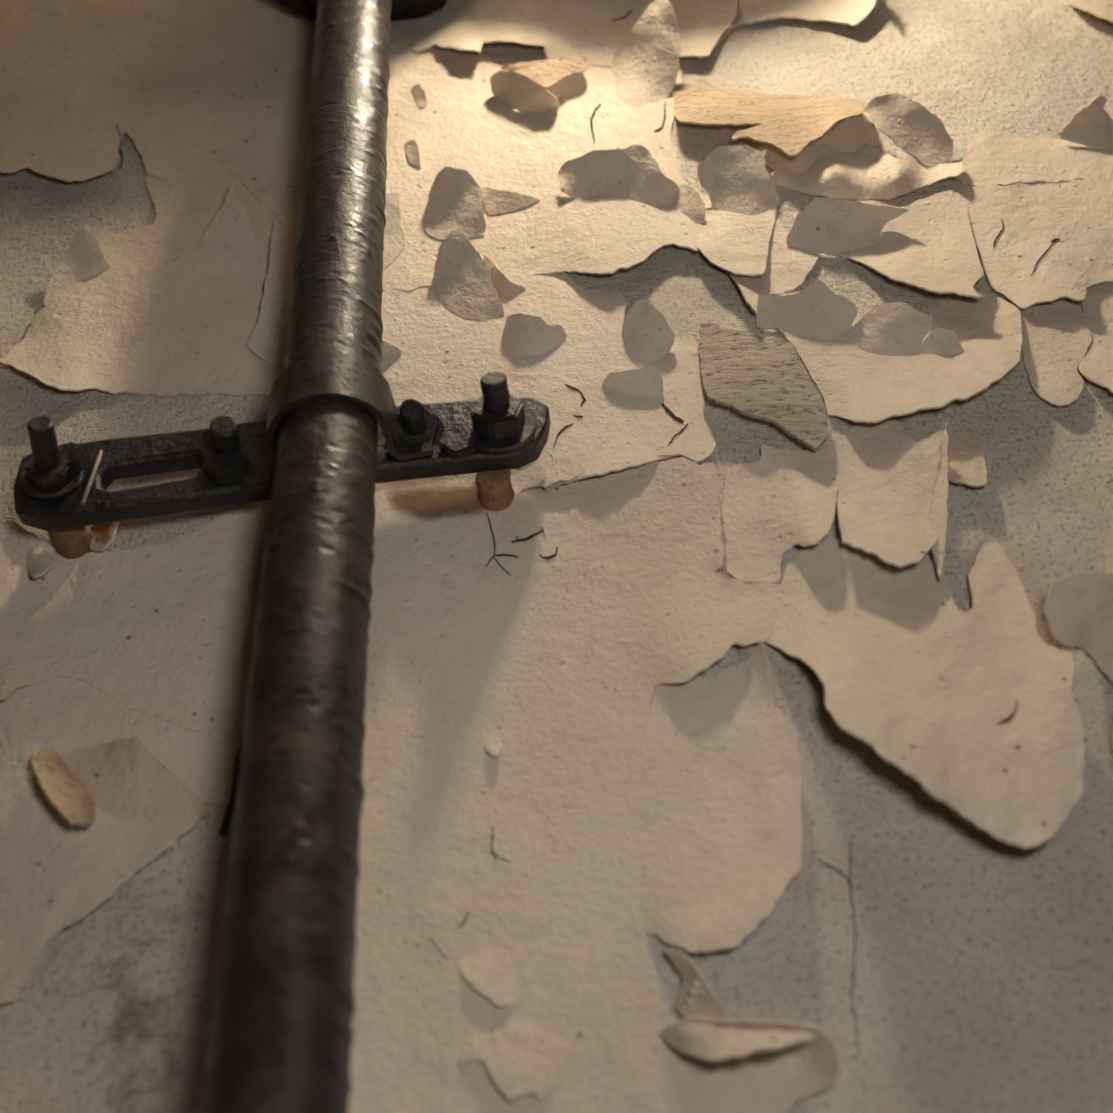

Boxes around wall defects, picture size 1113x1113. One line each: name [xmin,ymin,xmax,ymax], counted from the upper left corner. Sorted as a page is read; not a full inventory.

peeling [0,0,315,397]
peeling [0,500,271,1004]
peeling [348,0,1113,1113]